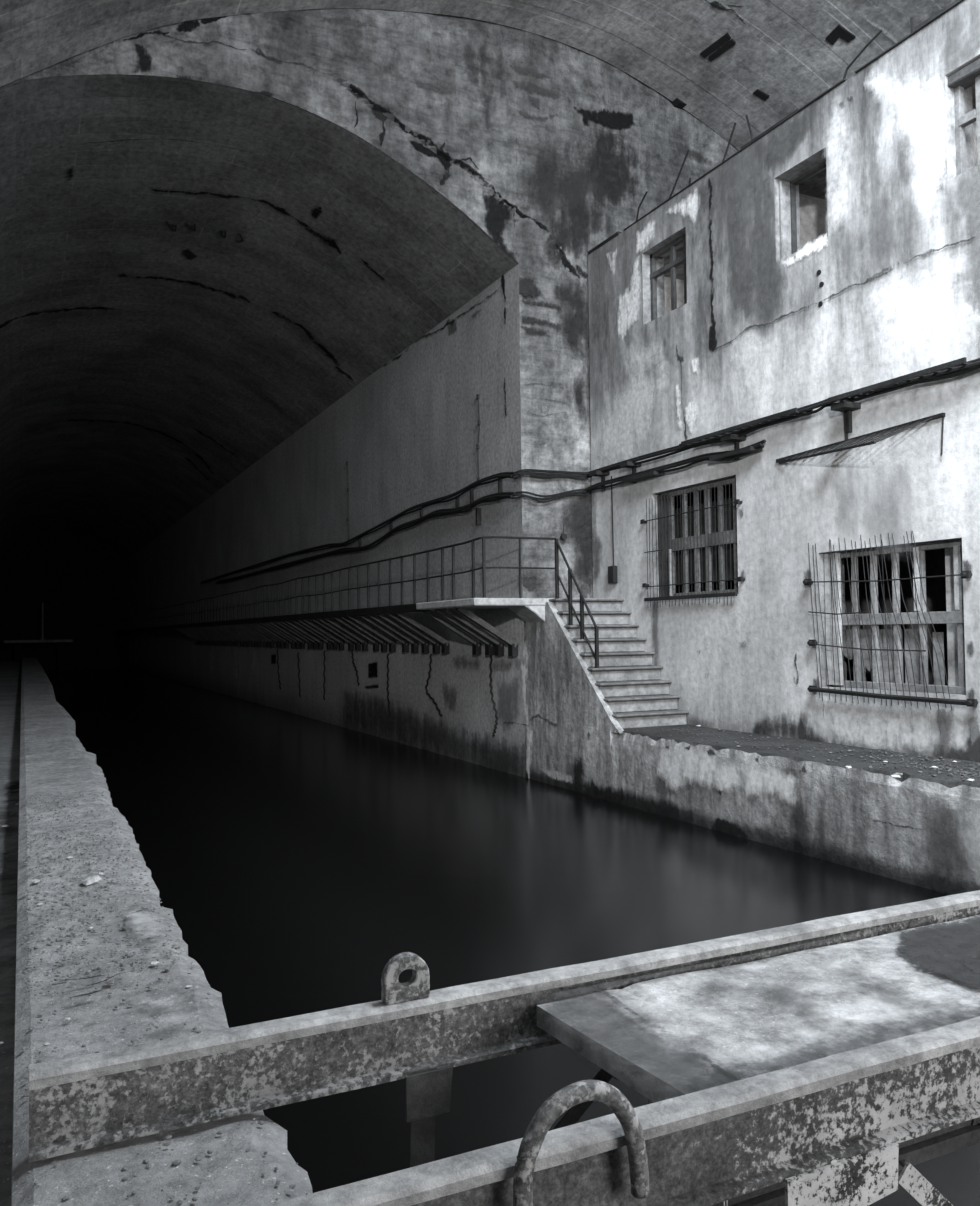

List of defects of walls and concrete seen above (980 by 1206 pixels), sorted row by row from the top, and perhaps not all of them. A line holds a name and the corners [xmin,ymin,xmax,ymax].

crack [705,0,744,24]
crack [858,12,898,43]
crack [116,13,588,280]
damp [525,134,636,259]
crack [119,274,353,380]
crack [383,275,506,366]
crack [676,178,974,440]
damp [573,759,693,822]
damp [657,746,824,846]
damp [754,717,825,742]
damp [925,800,964,865]
damp [934,735,980,763]